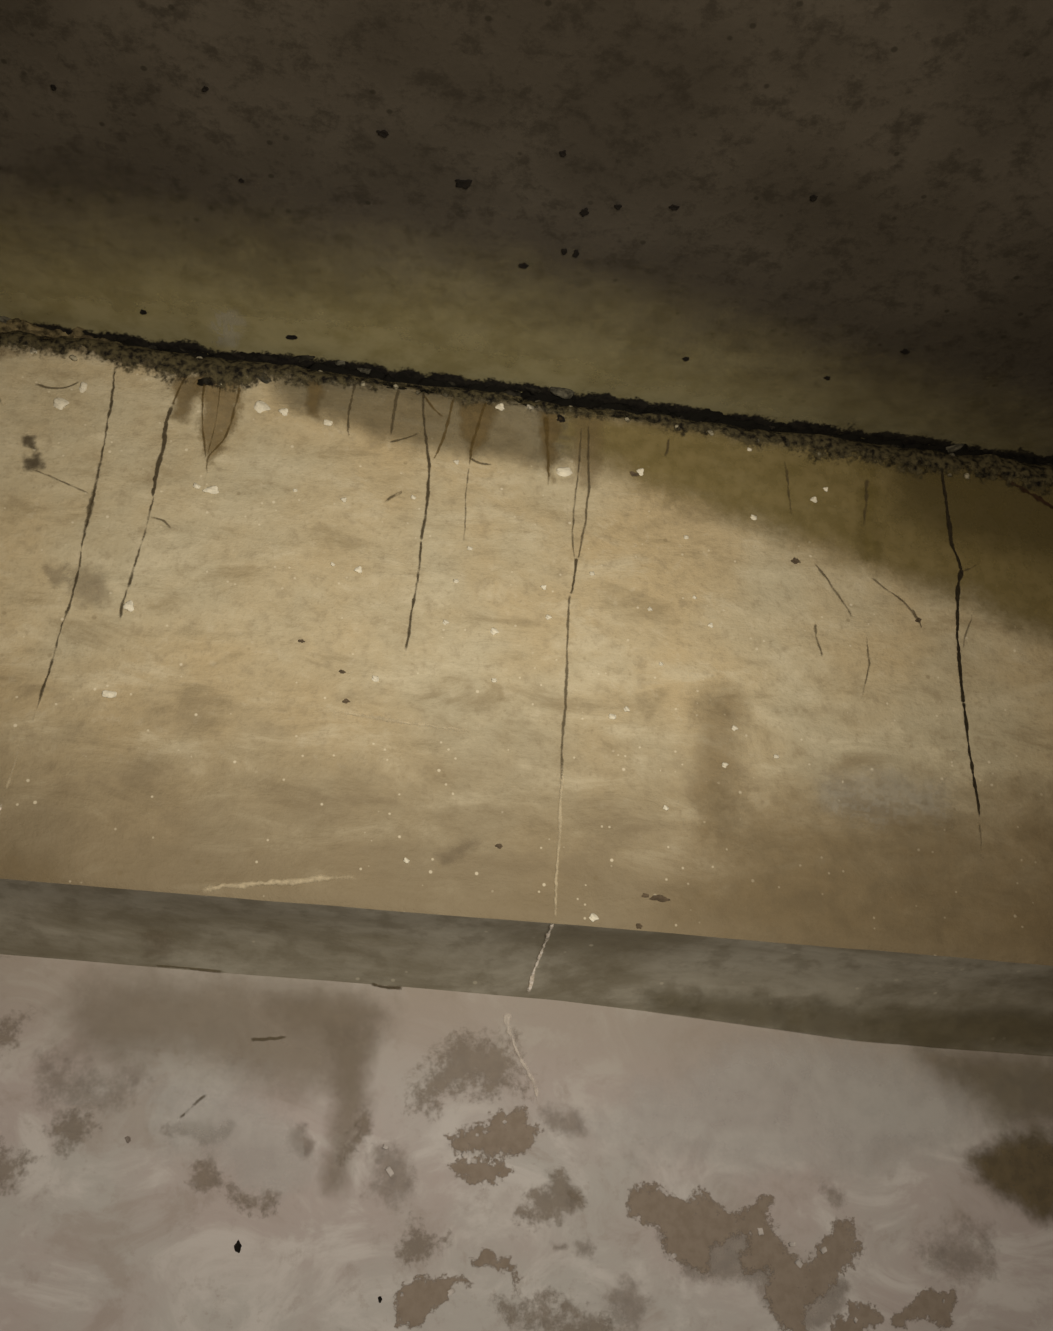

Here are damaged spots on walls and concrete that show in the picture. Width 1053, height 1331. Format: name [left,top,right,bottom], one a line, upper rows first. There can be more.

crack [38,372,115,701]
crack [120,378,185,617]
crack [347,384,356,429]
crack [391,390,488,647]
water stain [0,280,1053,628]
crack [544,418,590,827]
crack [940,470,980,815]
crack [504,859,558,1096]
peeling [378,1230,520,1328]
peeling [444,1106,543,1185]
peeling [625,1181,863,1331]
peeling [831,1288,957,1331]